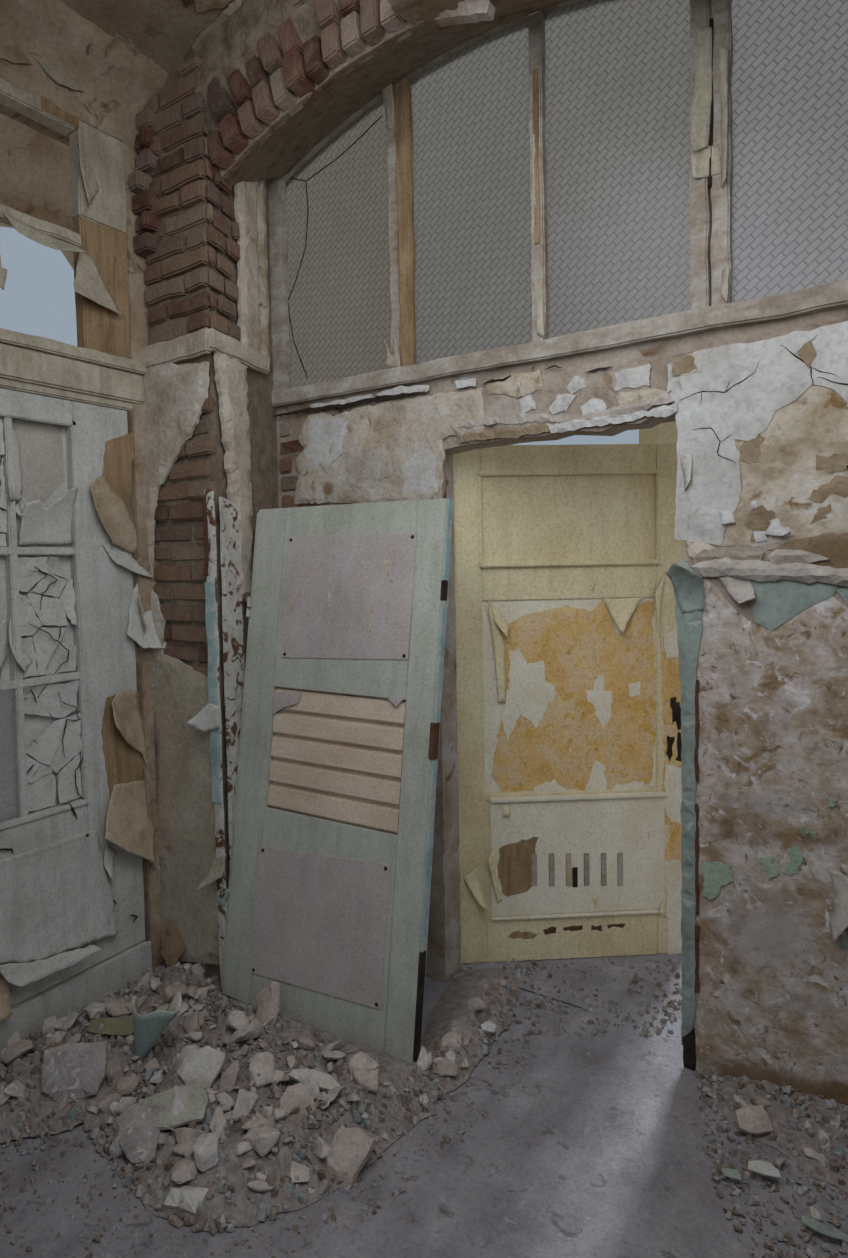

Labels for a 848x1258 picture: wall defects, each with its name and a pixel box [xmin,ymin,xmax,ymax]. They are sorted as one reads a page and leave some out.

peeling [690,25,728,188]
peeling [720,265,730,303]
flaking render [279,378,485,508]
crack [681,335,848,462]
flaking render [0,354,223,812]
peeling [487,598,509,702]
peeling [604,321,848,1071]
peeling [721,1160,781,1180]